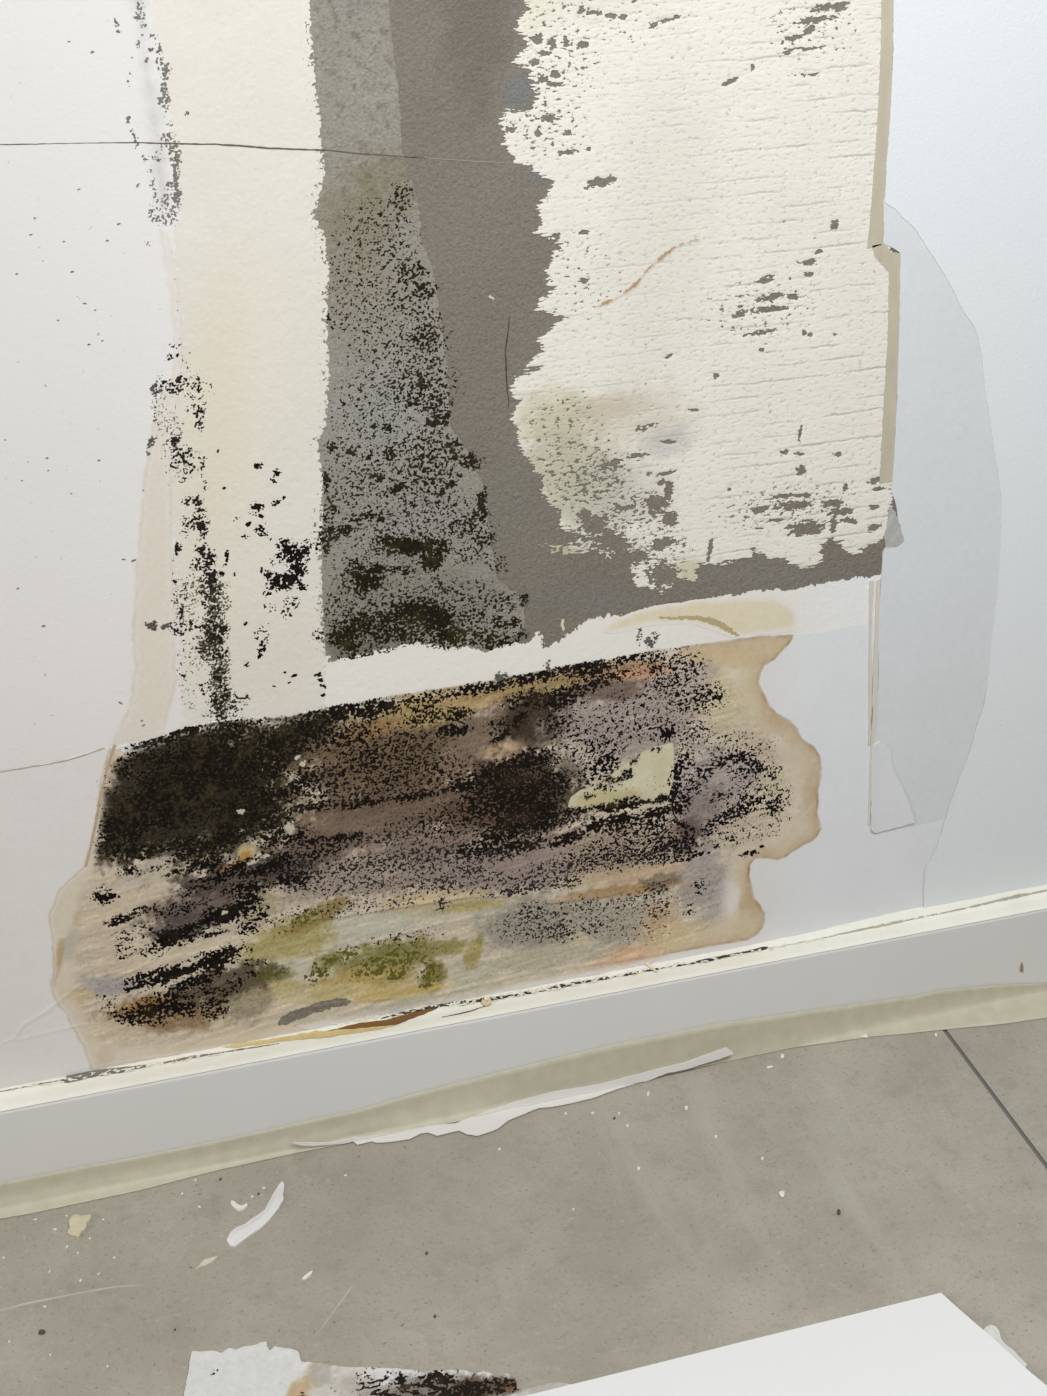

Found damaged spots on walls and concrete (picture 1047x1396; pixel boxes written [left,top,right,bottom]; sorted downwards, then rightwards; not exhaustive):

water stain [47,181,823,1071]
peeling [305,0,897,663]